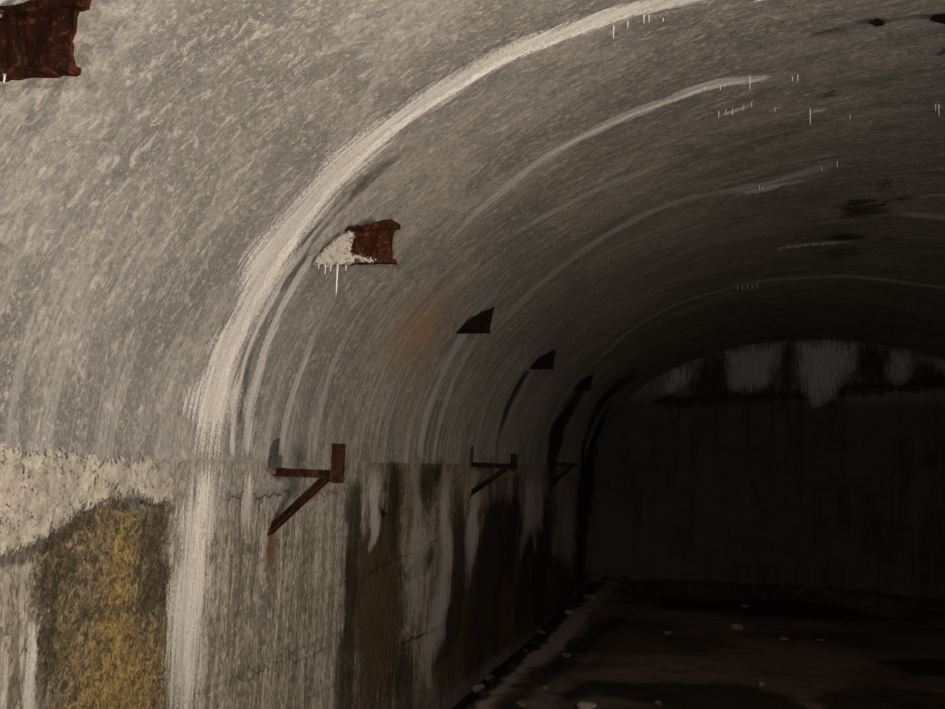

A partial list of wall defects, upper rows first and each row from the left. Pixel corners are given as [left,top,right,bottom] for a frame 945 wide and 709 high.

water stain [541,75,768,160]
water stain [745,178,787,193]
water stain [167,0,700,709]
water stain [26,650,36,677]